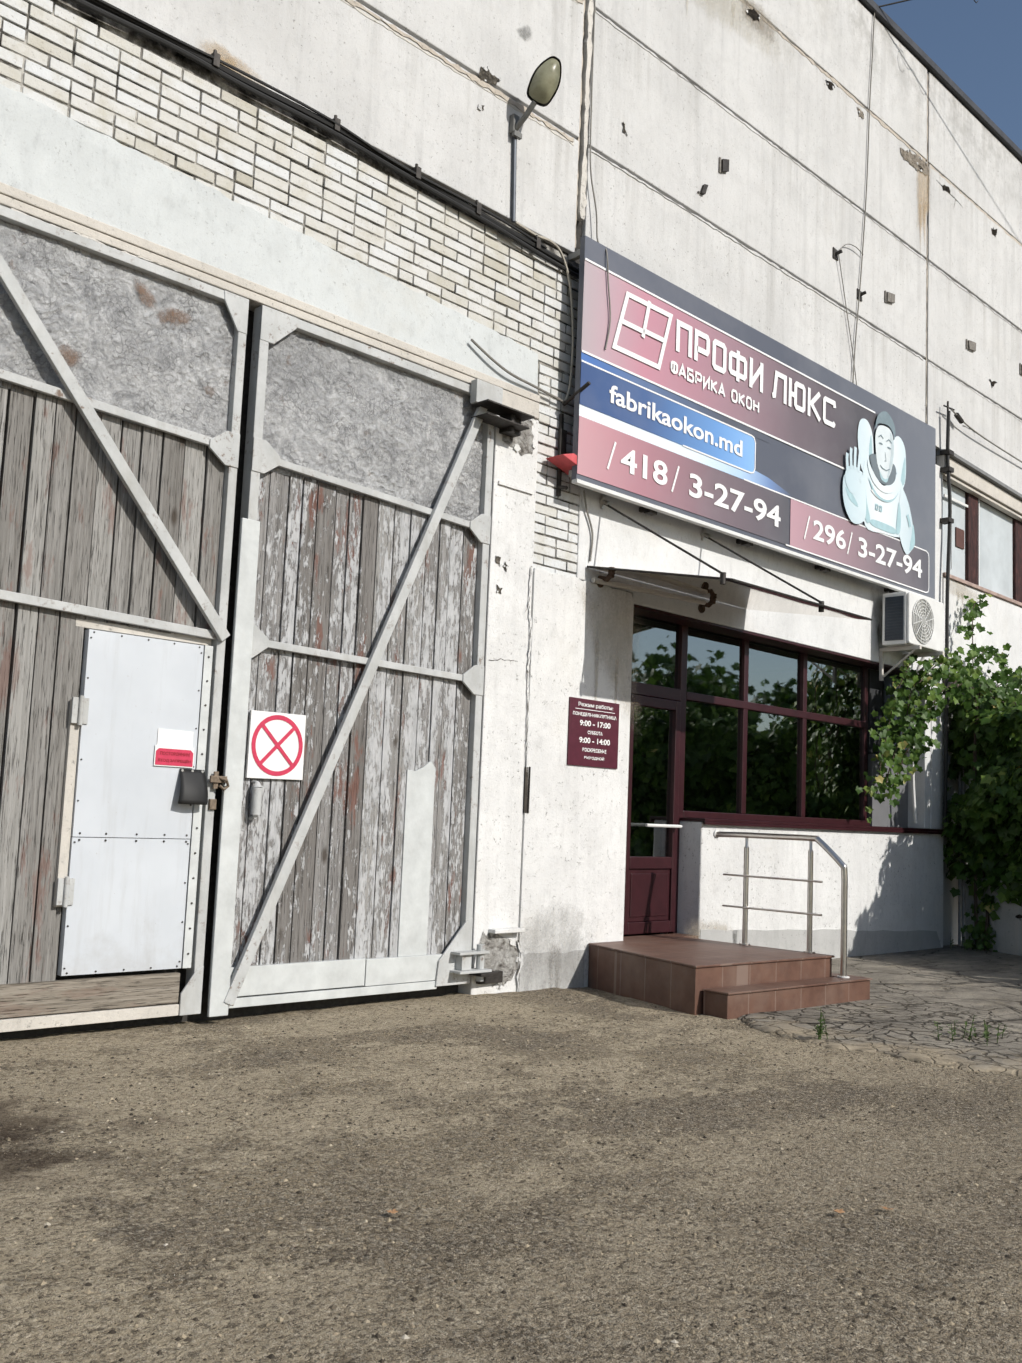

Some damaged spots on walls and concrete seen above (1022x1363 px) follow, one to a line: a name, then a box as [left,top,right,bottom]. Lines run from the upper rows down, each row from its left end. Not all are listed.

flaking render [480,932,522,989]
crack [806,973,1022,1034]